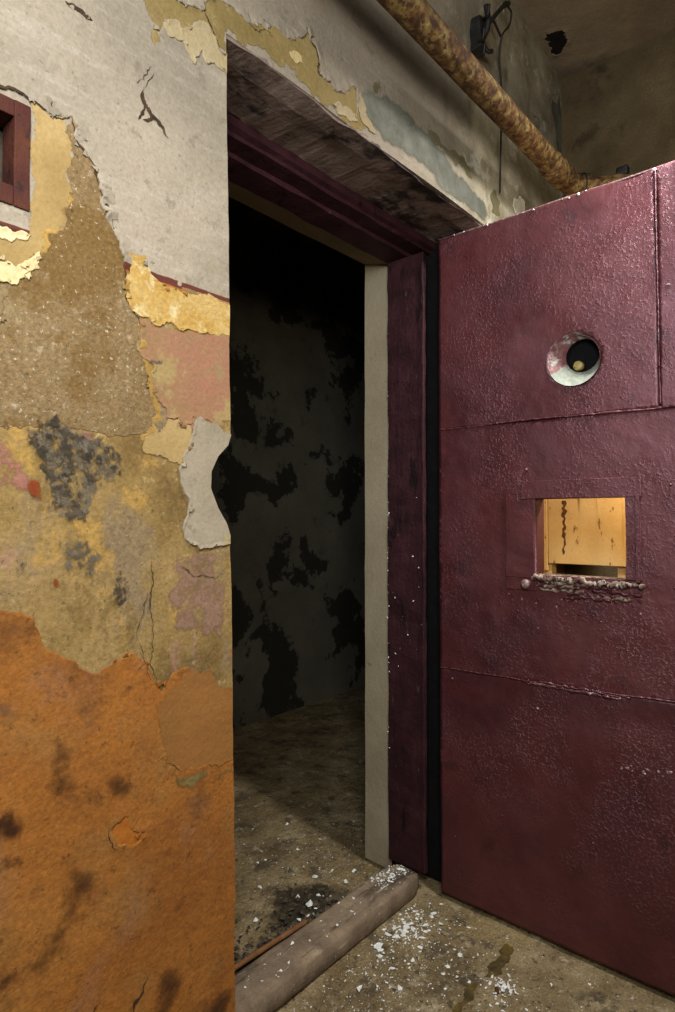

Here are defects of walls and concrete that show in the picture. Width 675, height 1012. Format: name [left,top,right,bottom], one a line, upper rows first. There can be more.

crack [137,68,167,136]
peeling [134,0,488,226]
leakage [26,415,122,522]
peeling [0,85,233,788]
leakage [60,536,101,576]
leakage [114,570,129,605]
leakage [0,813,22,836]
crack [133,975,149,1012]